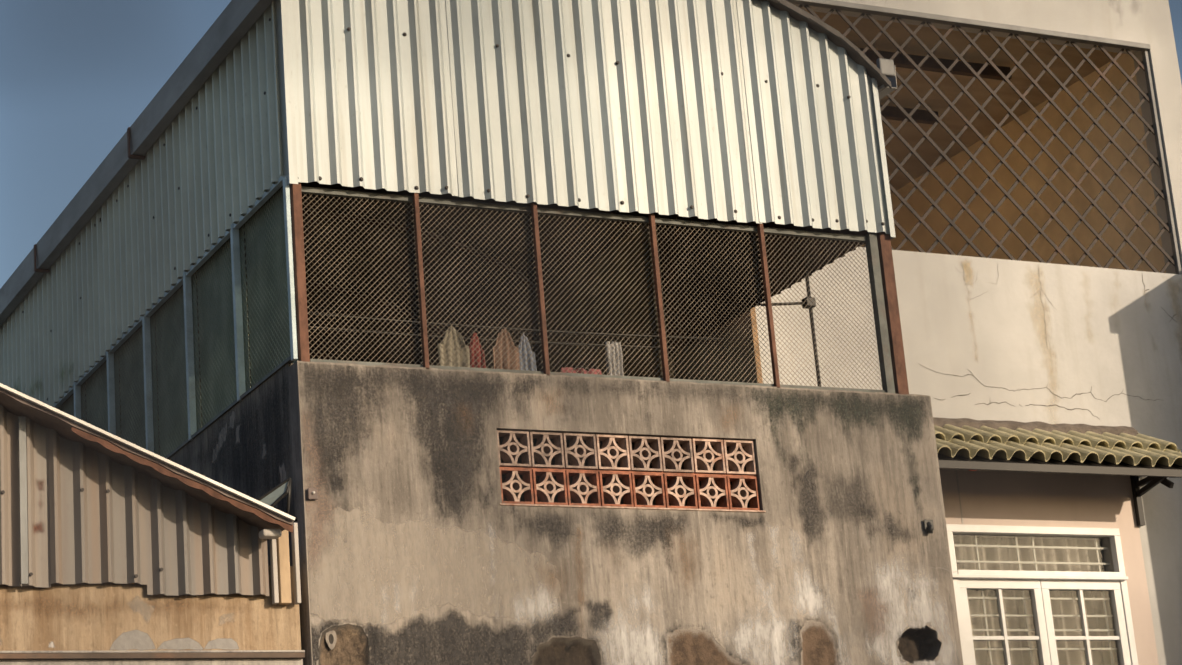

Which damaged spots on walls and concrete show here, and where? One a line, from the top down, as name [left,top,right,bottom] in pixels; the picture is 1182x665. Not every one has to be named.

crack [1030,269,1057,351]
crack [932,369,1164,418]
water stain [199,380,288,498]
water stain [307,369,487,517]
water stain [599,513,684,551]
water stain [365,611,505,665]
water stain [545,589,661,665]
spalling [898,627,921,663]